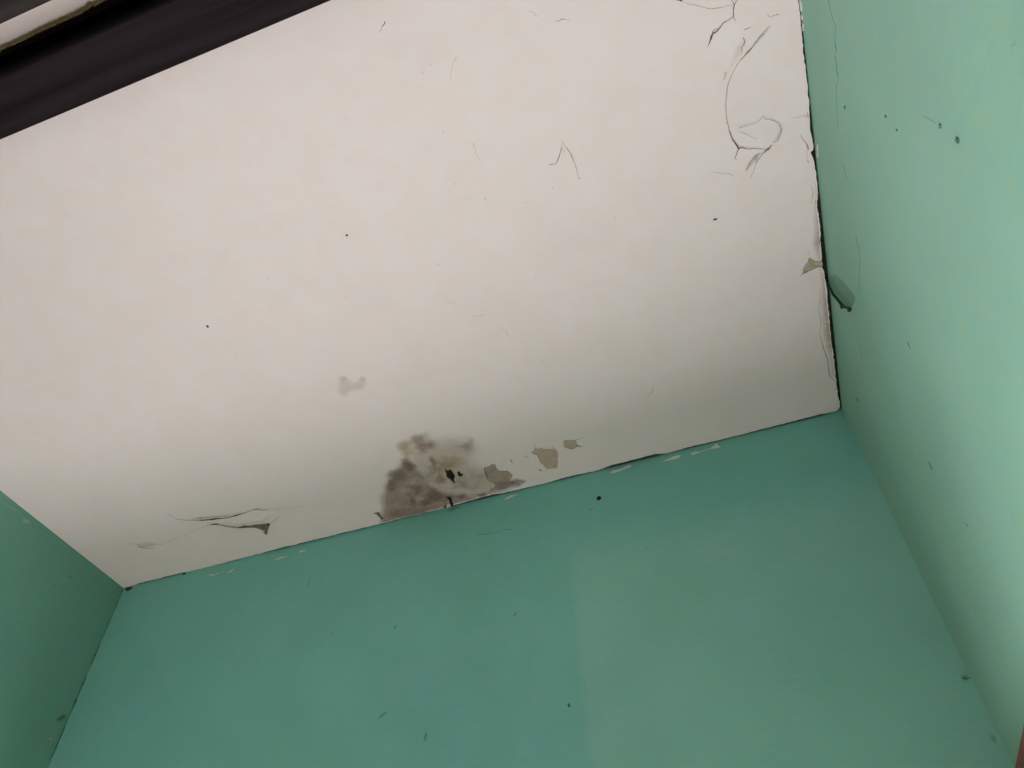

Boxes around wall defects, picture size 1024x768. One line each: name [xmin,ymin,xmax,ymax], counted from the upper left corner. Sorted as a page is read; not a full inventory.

crack [236,0,842,560]
leakage [383,460,484,522]
peeling [484,464,513,492]
peeling [531,438,582,469]